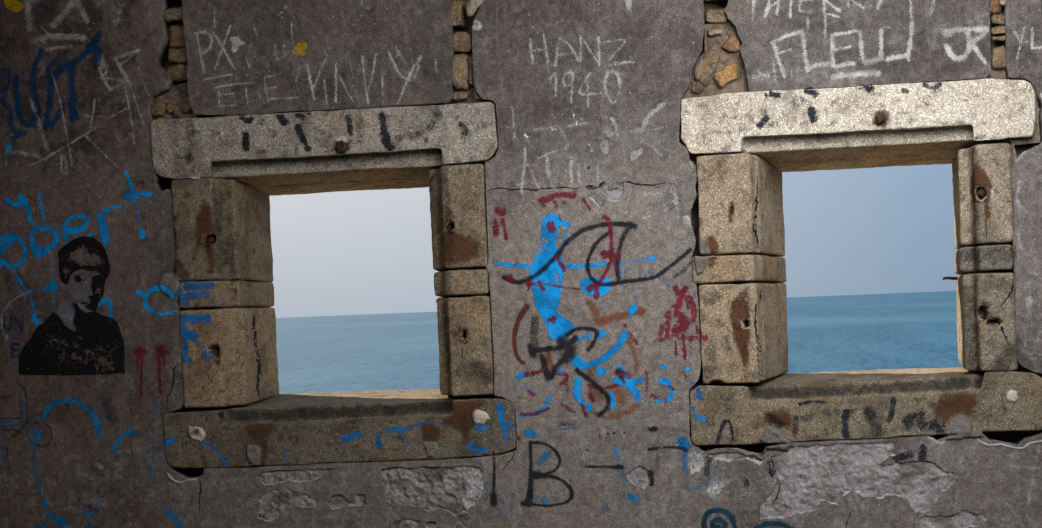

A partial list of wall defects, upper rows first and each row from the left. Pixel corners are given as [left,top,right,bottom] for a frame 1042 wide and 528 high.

crack [486,181,670,192]
corrosion [970,165,992,219]
corrosion [173,203,217,279]
corrosion [443,211,478,265]
corrosion [729,291,750,366]
spalling [256,468,367,522]
spalling [380,465,487,528]
spalling [688,437,987,528]